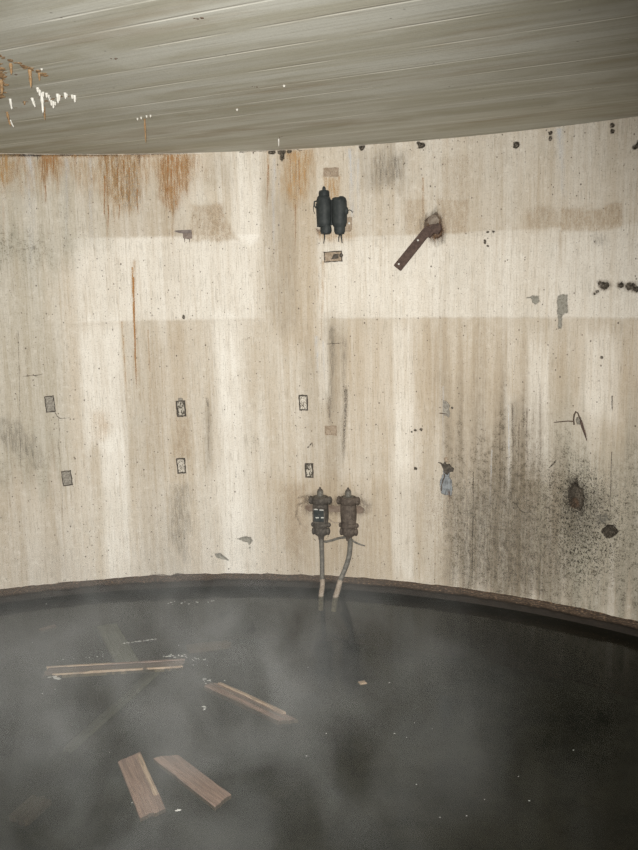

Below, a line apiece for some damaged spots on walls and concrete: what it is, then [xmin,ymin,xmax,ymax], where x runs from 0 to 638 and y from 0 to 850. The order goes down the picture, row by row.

rust [104,155,139,217]
rust [160,154,189,210]
mould [550,476,610,573]